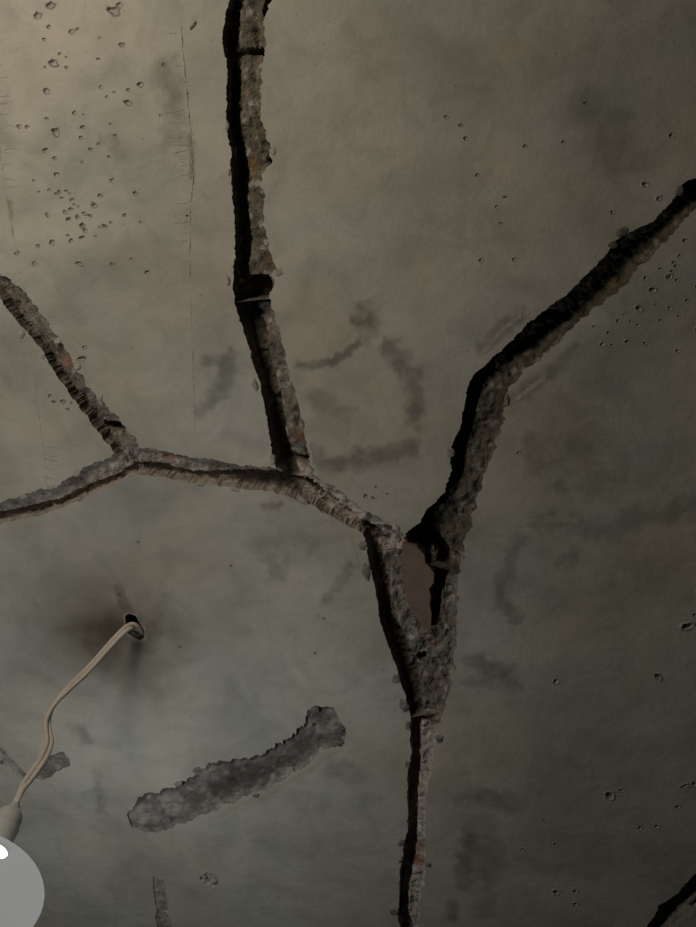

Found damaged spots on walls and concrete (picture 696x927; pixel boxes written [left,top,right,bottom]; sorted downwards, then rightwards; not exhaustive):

crack [409,178,696,574]
crack [0,0,459,927]
spalling [127,706,347,833]
spalling [153,877,172,927]
crack [647,874,696,927]